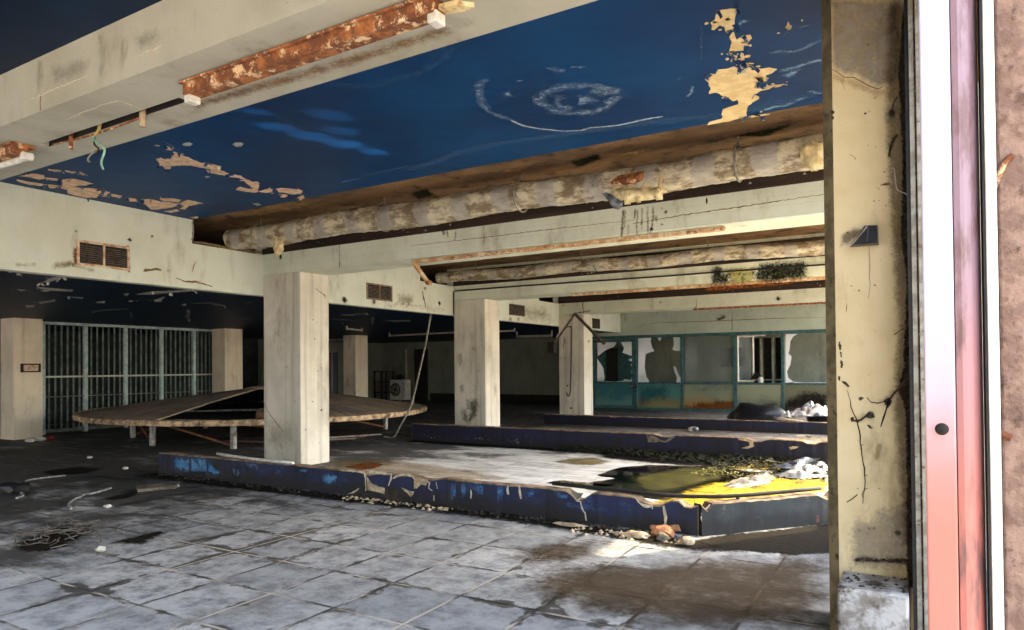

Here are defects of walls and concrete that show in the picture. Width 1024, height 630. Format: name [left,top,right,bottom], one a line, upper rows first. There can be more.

corrosion [198,32,441,106]
peeling [705,8,787,125]
peeling [17,169,262,253]
peeling [154,142,305,206]
water stain [711,261,807,300]
water stain [832,2,913,588]
spalling [346,477,428,501]
peeling [451,484,483,497]
crack [846,379,906,559]
spalling [650,524,681,537]
water stain [525,544,827,628]